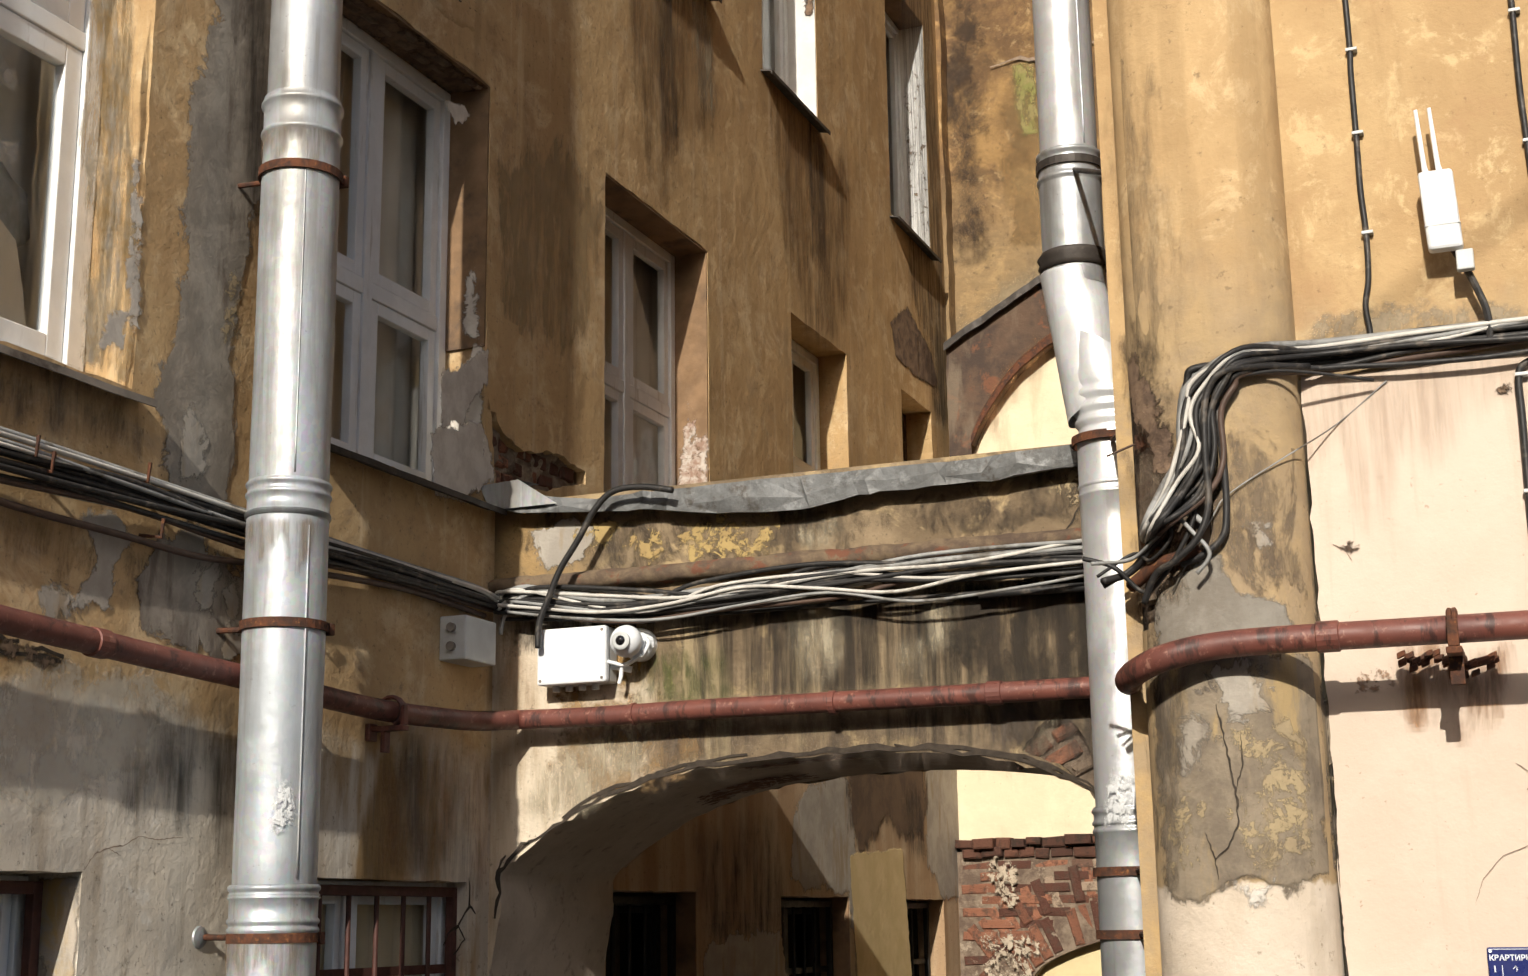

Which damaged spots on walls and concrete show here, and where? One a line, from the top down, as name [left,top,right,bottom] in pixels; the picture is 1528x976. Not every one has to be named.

peeling [79,0,144,383]
peeling [135,0,271,662]
spalling [430,271,575,504]
water stain [902,0,986,423]
water stain [988,271,1040,311]
peeling [531,512,784,571]
crack [0,634,64,670]
water stain [514,615,654,654]
water stain [684,575,1089,694]
crack [1205,705,1244,880]
peeling [1151,653,1337,907]
flaking render [981,932,1045,976]